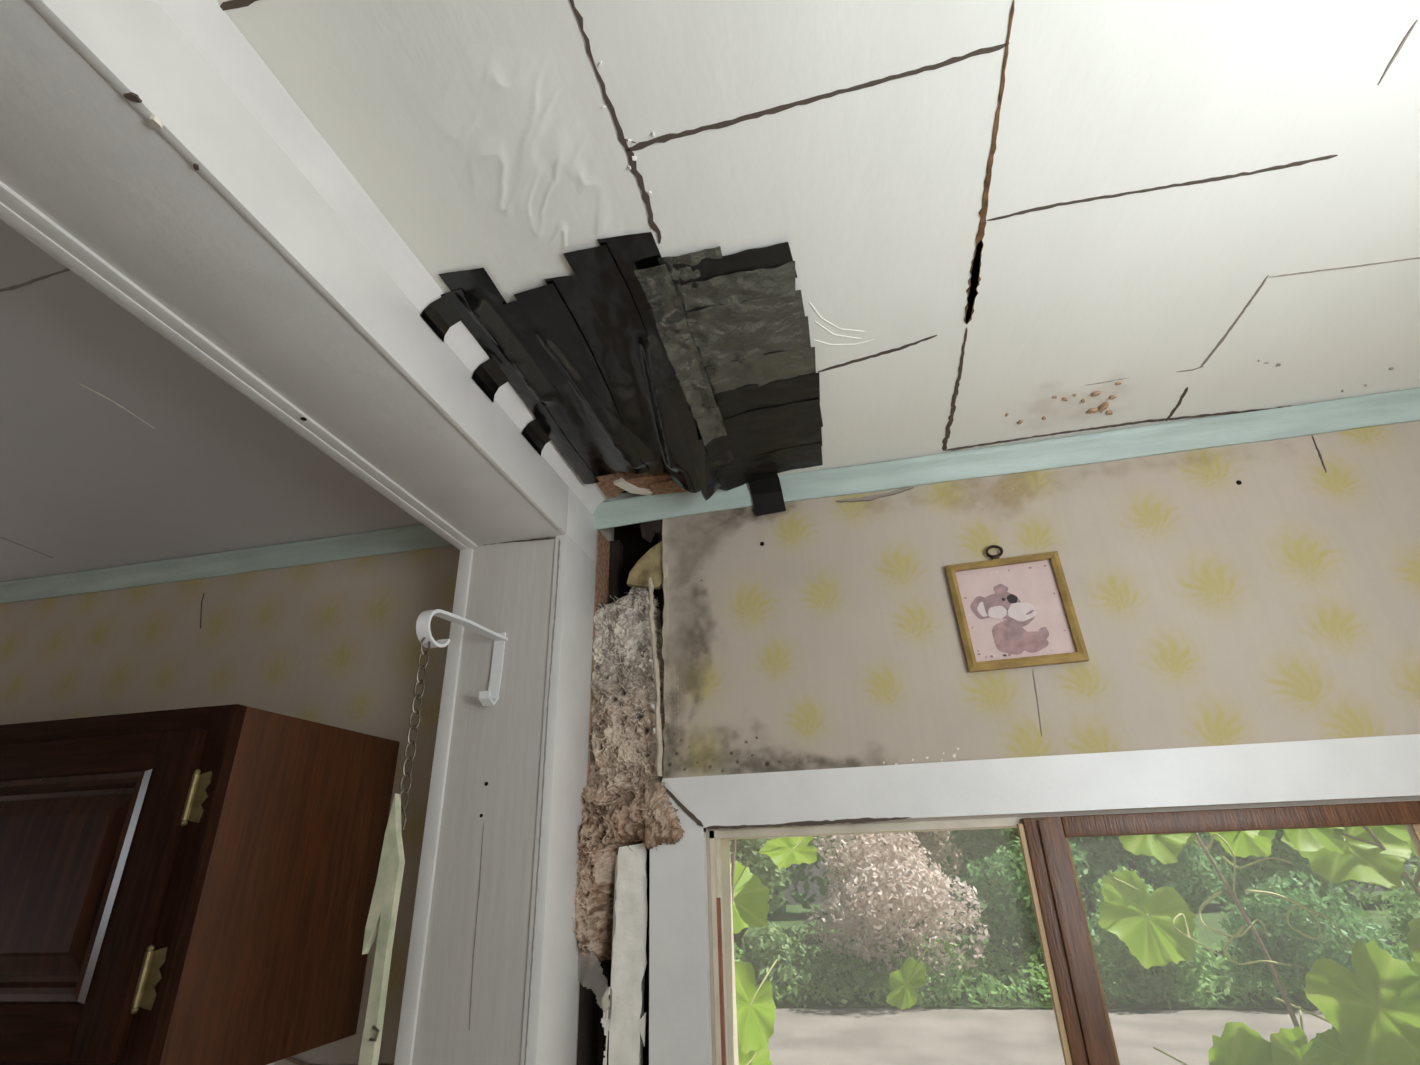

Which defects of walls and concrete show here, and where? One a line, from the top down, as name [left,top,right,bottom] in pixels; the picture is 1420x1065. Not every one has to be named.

crack [220,0,258,11]
crack [0,268,70,292]
crack [570,0,1420,473]
spalling [588,519,670,780]
spalling [577,960,611,1065]